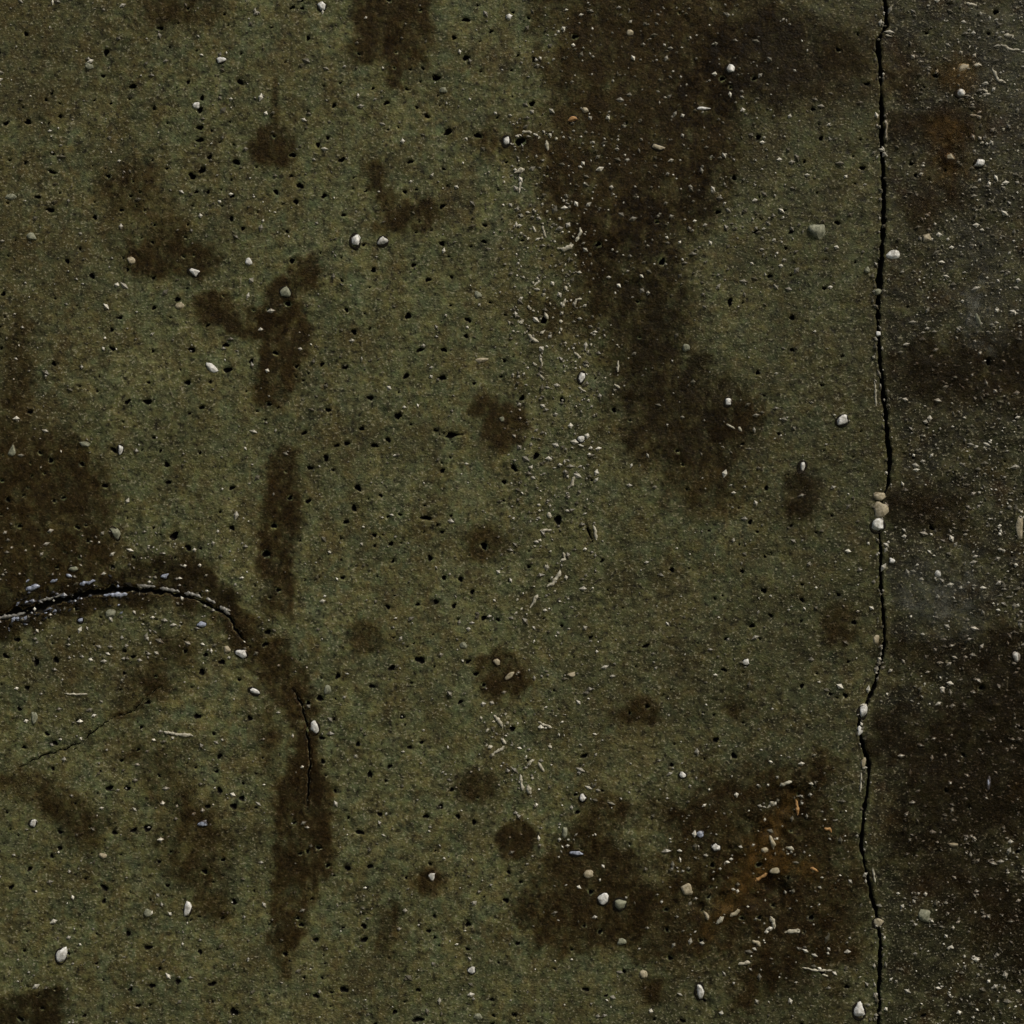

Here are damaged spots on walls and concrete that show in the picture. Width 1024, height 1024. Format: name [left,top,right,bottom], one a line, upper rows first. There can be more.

leakage [508,0,801,455]
crack [0,574,252,648]
leakage [0,444,293,679]
leakage [514,552,566,614]
crack [854,0,895,1024]
crack [19,678,169,770]
crack [289,688,314,809]
leakage [539,839,622,940]
leakage [778,871,832,977]